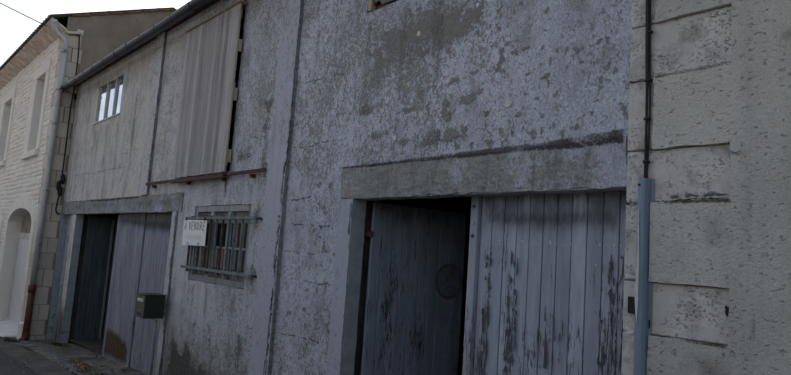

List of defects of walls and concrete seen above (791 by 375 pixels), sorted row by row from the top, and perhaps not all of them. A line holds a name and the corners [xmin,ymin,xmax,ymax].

damp [368,0,502,89]
crack [245,70,354,375]
peeling [478,248,492,375]
peeling [503,250,518,375]
peeling [531,307,563,370]